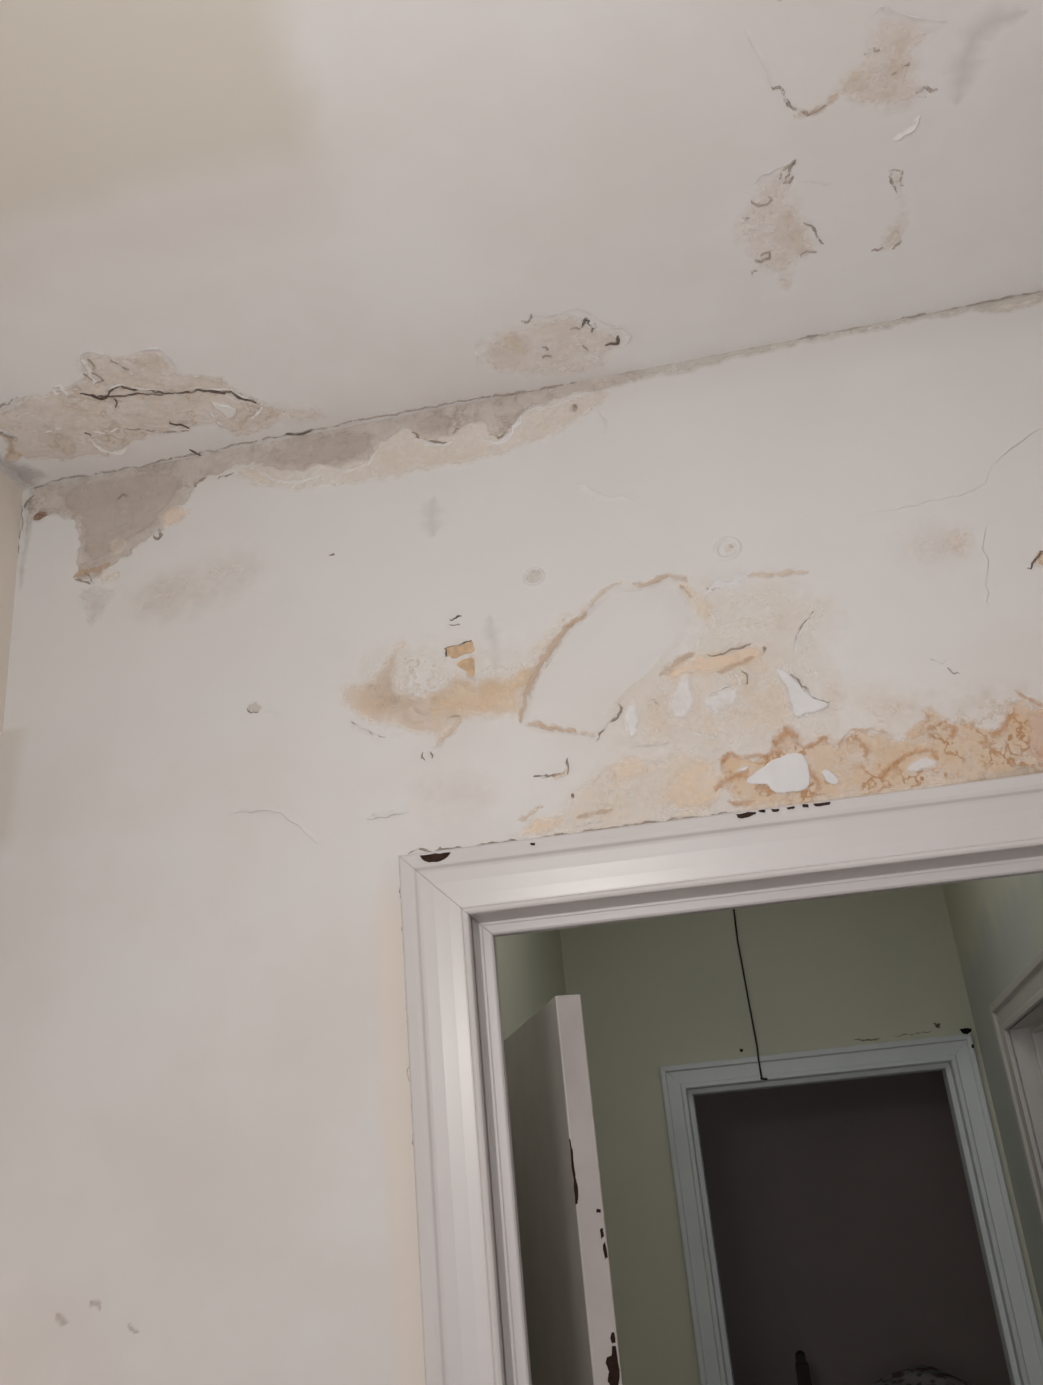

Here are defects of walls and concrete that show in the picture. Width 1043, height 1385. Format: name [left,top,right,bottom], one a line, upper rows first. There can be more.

peeling [746,157,832,219]
peeling [521,307,631,350]
peeling [0,347,642,584]
peeling [444,640,475,677]
damp [347,660,528,741]
peeling [626,643,829,749]
peeling [736,802,830,818]
peeling [569,1139,578,1204]
peeling [606,1332,620,1385]